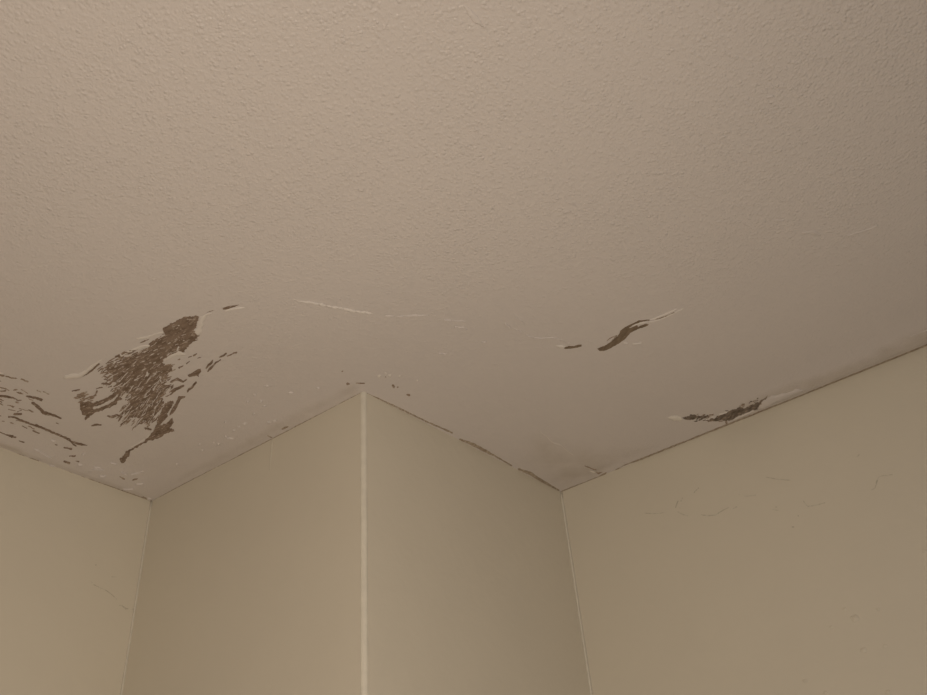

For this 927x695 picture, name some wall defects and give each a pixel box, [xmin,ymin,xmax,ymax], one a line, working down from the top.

peeling [0,372,87,463]
peeling [63,305,245,463]
crack [70,344,927,501]
crack [557,308,684,351]